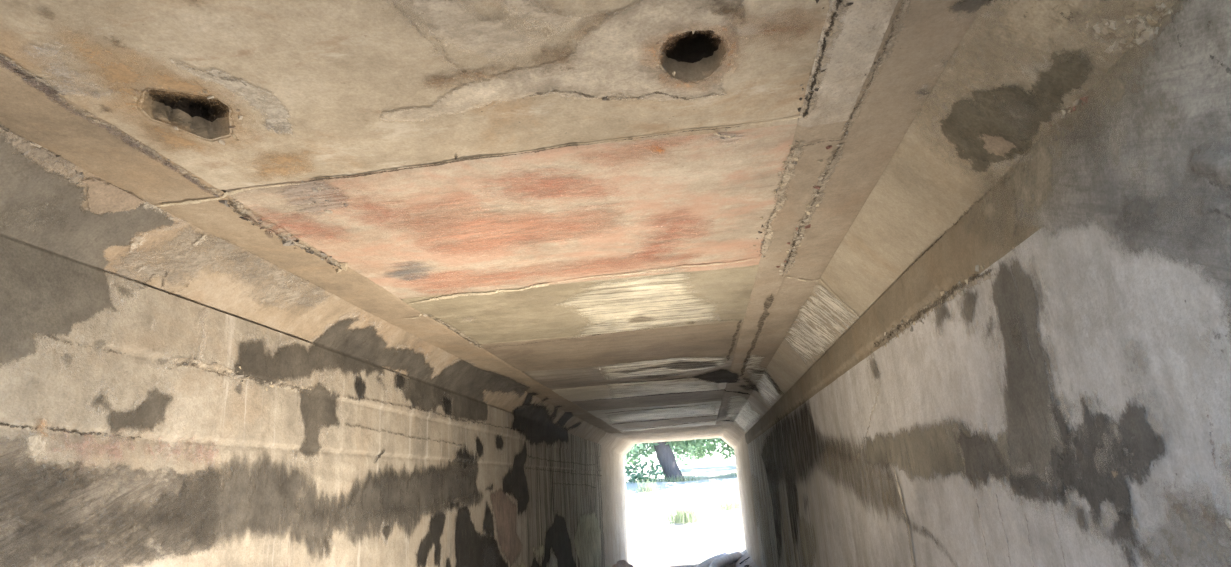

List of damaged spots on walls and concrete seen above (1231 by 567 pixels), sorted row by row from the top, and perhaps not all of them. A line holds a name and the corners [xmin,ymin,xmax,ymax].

crack [529,90,727,101]
damp [915,0,1167,182]
crack [310,124,751,181]
damp [28,419,47,453]
crack [0,423,141,439]
damp [154,317,601,567]
damp [597,355,781,431]
damp [751,258,1165,567]